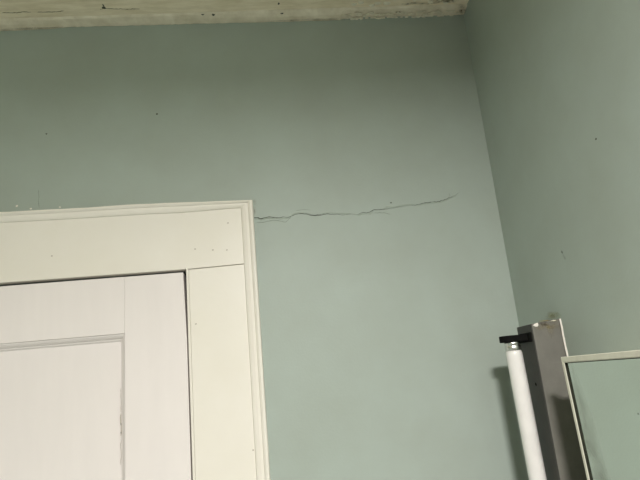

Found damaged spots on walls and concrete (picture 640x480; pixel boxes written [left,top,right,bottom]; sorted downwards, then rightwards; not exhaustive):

crack [254,193,458,223]